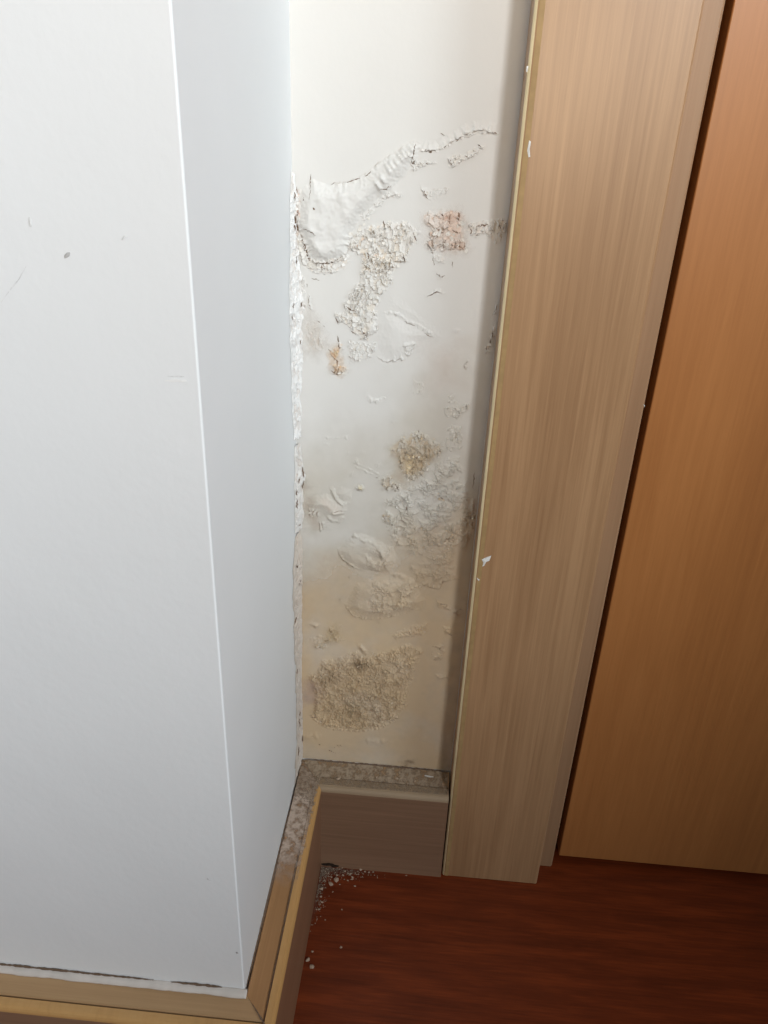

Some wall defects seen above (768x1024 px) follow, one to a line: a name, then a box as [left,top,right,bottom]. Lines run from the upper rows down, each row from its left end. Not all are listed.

peeling [292,119,508,377]
flaking render [388,427,449,487]
leakage [301,523,476,770]